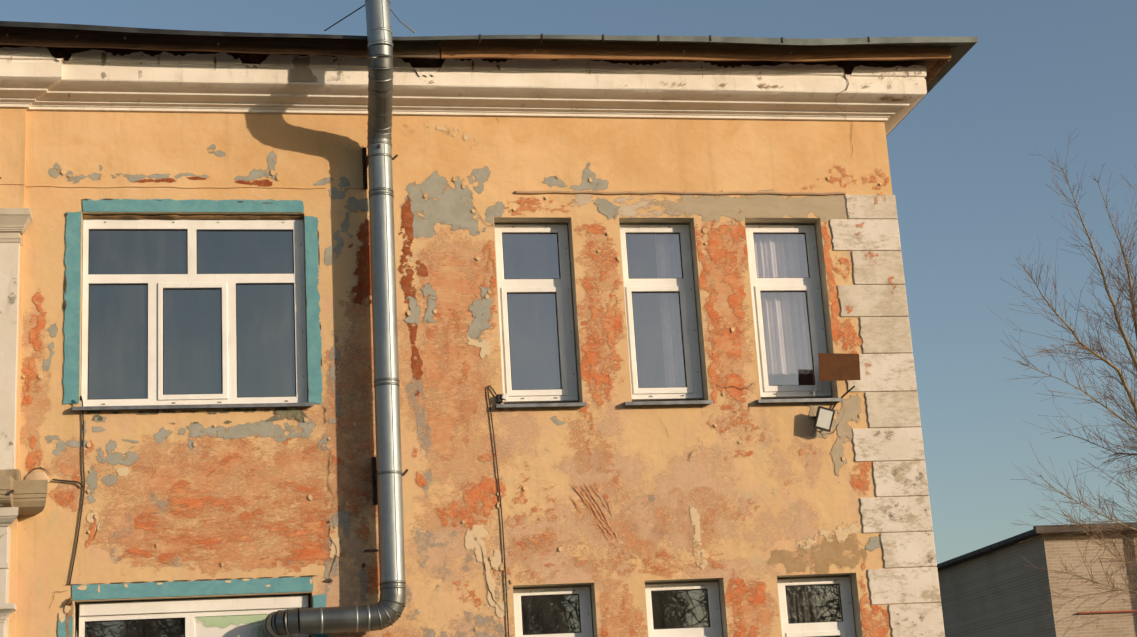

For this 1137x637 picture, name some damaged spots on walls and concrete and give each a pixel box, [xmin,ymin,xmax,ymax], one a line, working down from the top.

flaking render [55,51,74,60]
flaking render [237,54,269,64]
flaking render [289,56,317,81]
flaking render [406,58,441,68]
peeling [48,163,209,184]
peeling [6,177,380,607]
peeling [339,162,817,637]
flaking render [799,393,872,495]